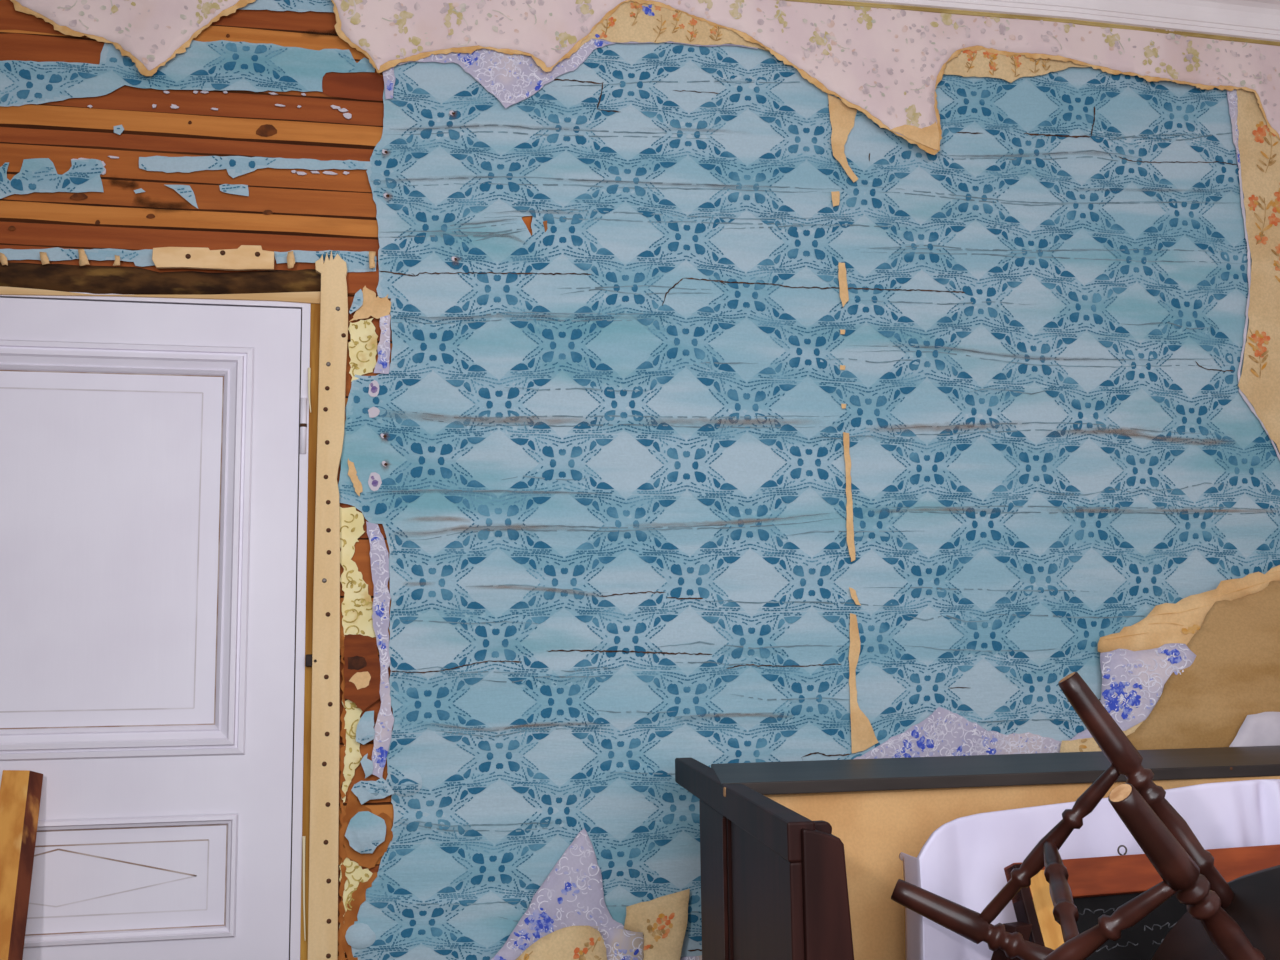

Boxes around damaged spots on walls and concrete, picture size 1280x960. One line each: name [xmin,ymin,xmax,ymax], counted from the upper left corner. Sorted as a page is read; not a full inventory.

crack [380,269,591,277]
crack [662,278,965,306]
peeling [349,671,371,690]